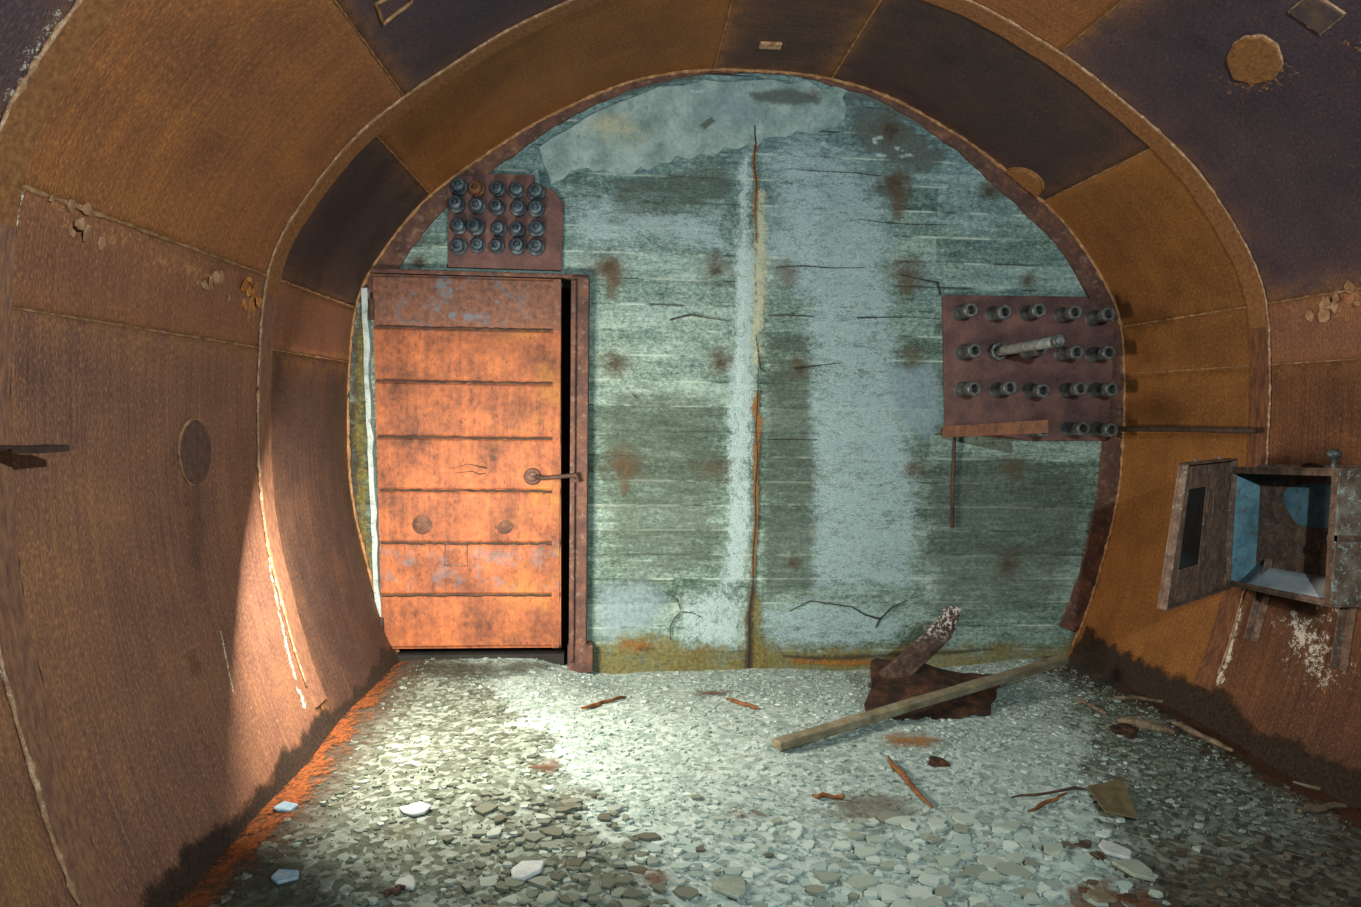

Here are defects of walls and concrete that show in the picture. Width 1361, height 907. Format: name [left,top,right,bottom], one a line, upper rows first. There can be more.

damp [567,140,938,674]
corrosion [176,662,407,907]
crack [789,600,908,628]
damp [926,600,1361,811]